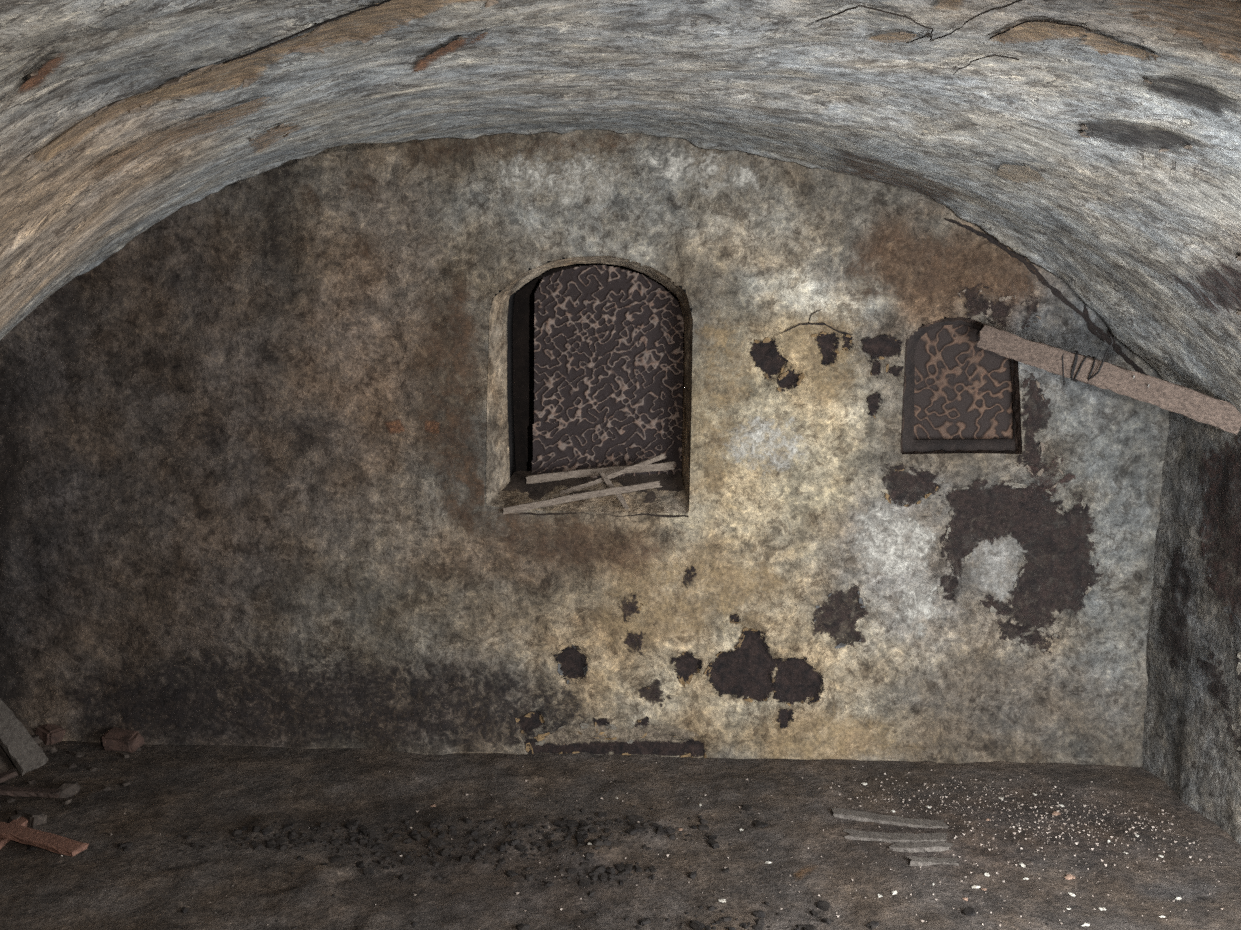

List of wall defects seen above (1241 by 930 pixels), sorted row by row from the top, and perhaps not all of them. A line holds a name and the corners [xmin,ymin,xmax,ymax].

flaking render [989,20,1158,61]
flaking render [1105,0,1241,63]
flaking render [27,0,498,162]
flaking render [1143,78,1241,117]
leakage [991,126,1074,163]
flaking render [1080,121,1200,152]
leakage [1178,176,1241,225]
flaking render [957,283,1044,329]
flaking render [1170,247,1241,315]
flaking render [750,337,805,392]
flaking render [811,332,904,418]
leakage [972,537,1022,602]